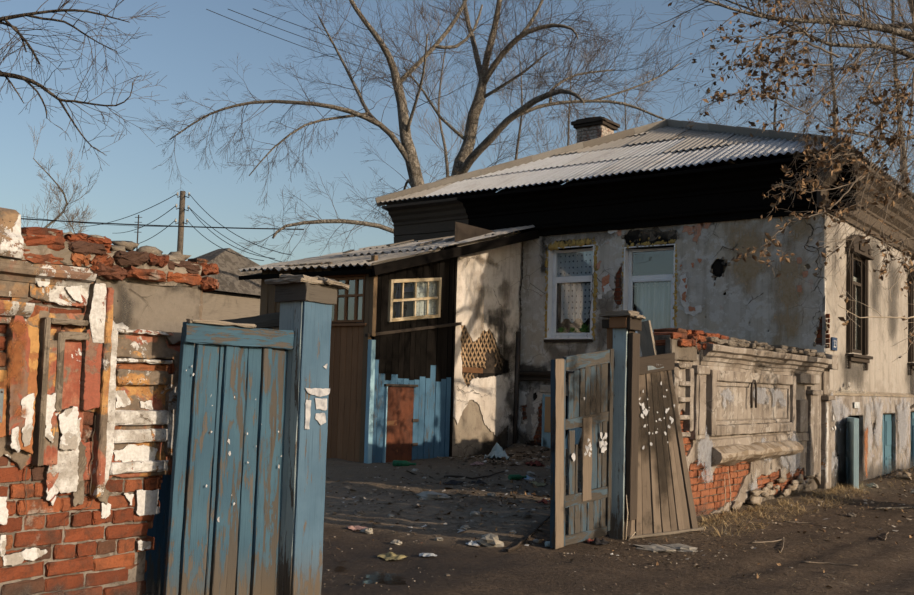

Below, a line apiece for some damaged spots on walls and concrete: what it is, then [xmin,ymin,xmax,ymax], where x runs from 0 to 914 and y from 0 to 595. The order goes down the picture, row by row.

spalling [710,256,731,286]
peeling [64,285,83,303]
damp [476,286,484,322]
spalling [460,325,503,387]
peeling [115,390,154,410]
peeling [5,393,35,453]
peeling [41,393,87,507]
peeling [113,444,158,463]
spalling [680,411,806,516]
peeling [96,487,160,519]
peeling [0,496,47,566]
peeling [135,540,152,551]